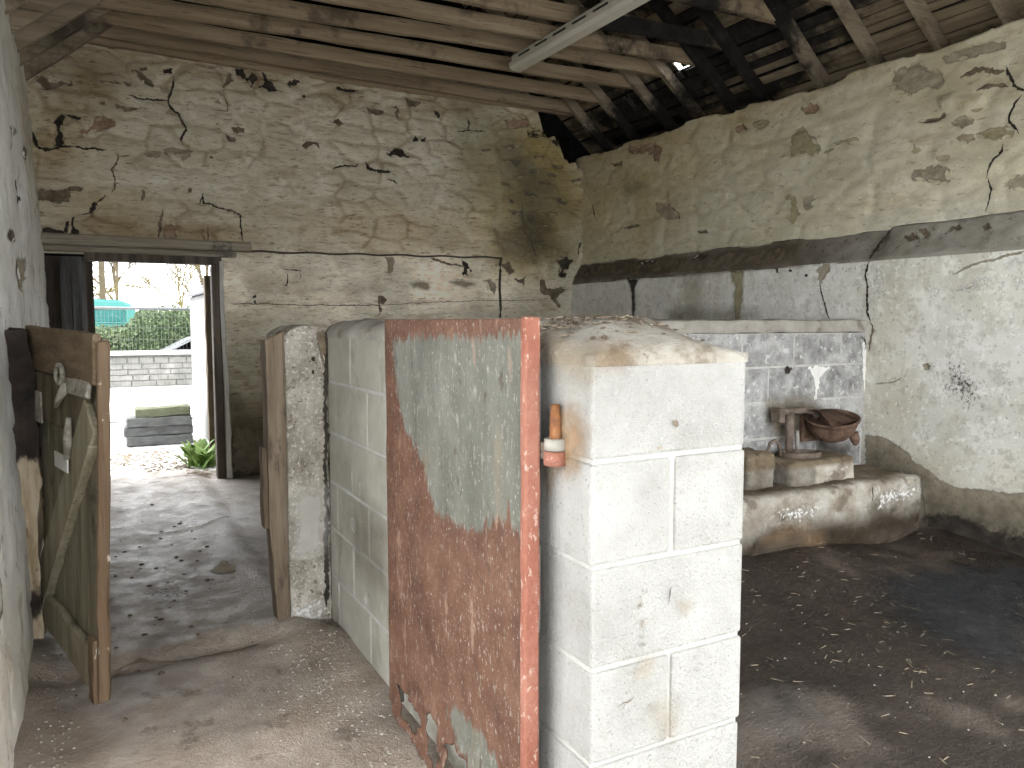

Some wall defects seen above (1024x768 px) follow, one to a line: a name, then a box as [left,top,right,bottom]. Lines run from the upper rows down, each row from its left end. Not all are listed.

peeling [893,42,1006,95]
crack [32,132,129,215]
peeling [52,102,141,146]
crack [129,79,187,145]
spalling [611,143,662,167]
peeling [789,127,859,156]
peeling [912,155,950,183]
crack [960,66,1024,212]
crack [196,195,243,241]
crack [861,230,890,352]
leakage [808,365,830,401]
leakage [943,362,983,407]